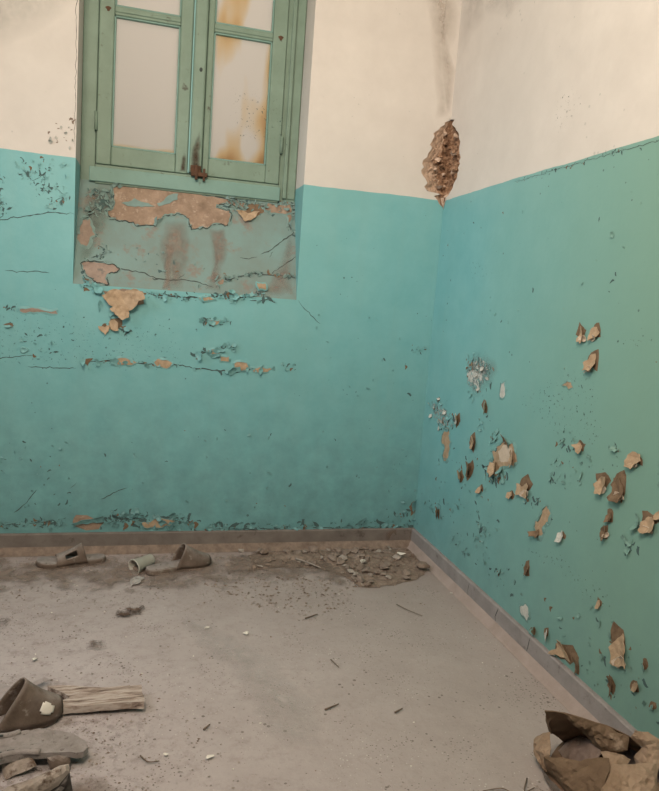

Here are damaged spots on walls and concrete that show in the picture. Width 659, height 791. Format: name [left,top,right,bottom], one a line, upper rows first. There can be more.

crack [0,212,73,220]
peeling [15,156,70,212]
crack [121,268,214,288]
peeling [76,183,296,356]
crack [240,232,295,279]
crack [0,355,275,376]
peeling [523,322,604,489]
peeling [0,341,553,586]
peeling [593,443,643,541]
peeling [620,511,659,556]
peeling [510,560,594,675]
peeling [588,618,657,714]